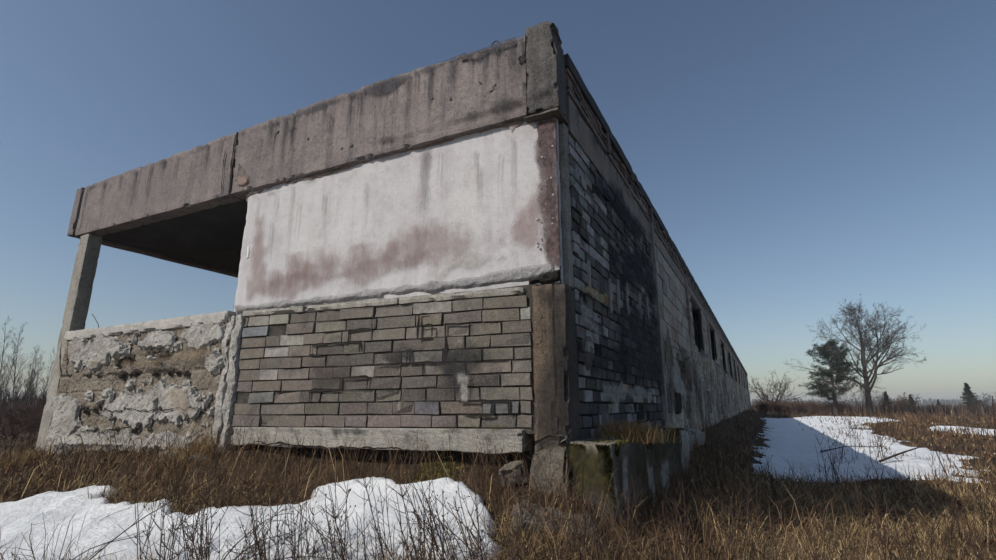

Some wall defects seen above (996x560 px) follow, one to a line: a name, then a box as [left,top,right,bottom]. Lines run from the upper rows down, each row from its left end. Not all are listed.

leakage [258,37,524,142]
peeling [68,322,226,376]
peeling [41,377,216,456]
leakage [622,432,690,525]